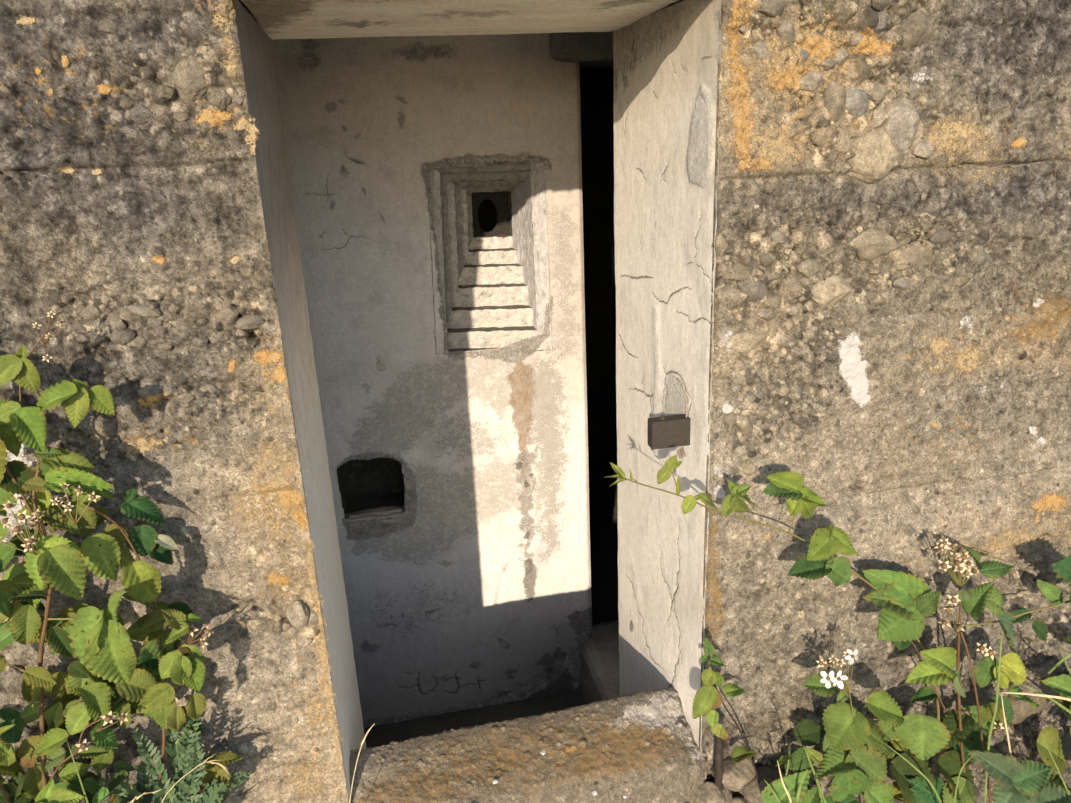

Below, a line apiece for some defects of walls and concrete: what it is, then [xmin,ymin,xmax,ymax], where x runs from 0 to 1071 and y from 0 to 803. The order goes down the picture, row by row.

spalling [665,375,690,416]
leakage [513,448,539,593]
crack [402,670,485,695]
crack [627,534,682,687]